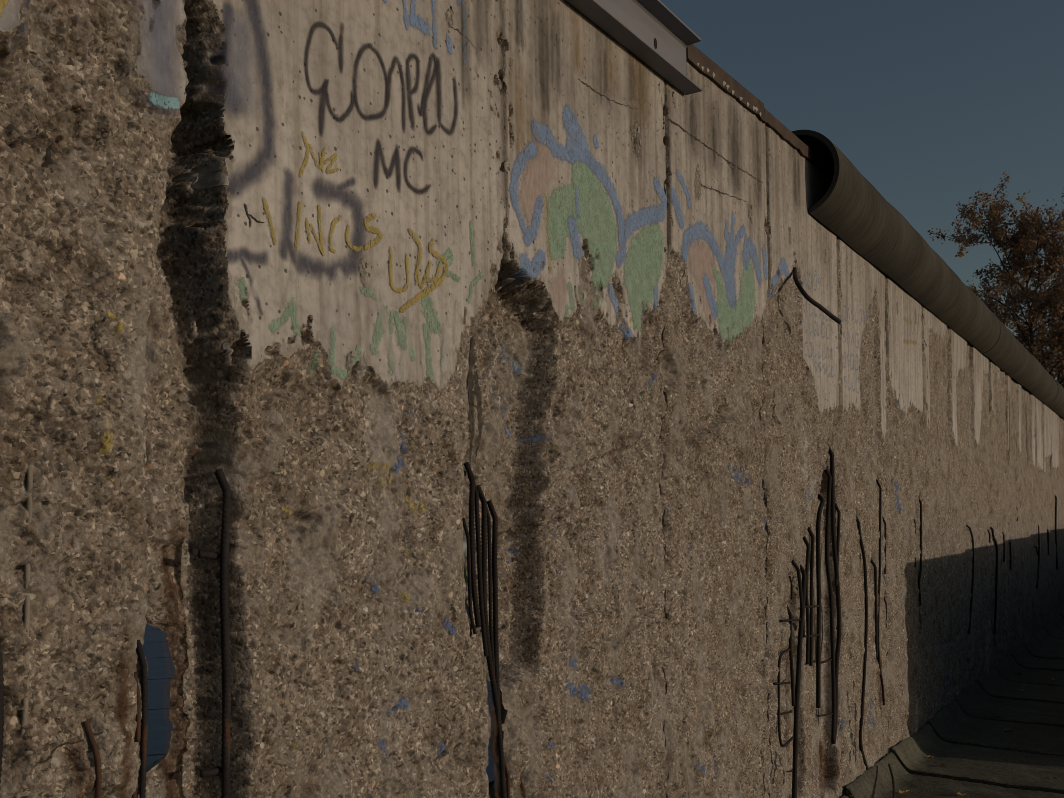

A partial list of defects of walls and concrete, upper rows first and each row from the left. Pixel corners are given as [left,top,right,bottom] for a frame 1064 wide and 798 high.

spalling [490,31,514,173]
spalling [658,83,677,230]
spalling [764,148,772,252]
spalling [0,0,510,798]
spalling [470,213,1064,798]